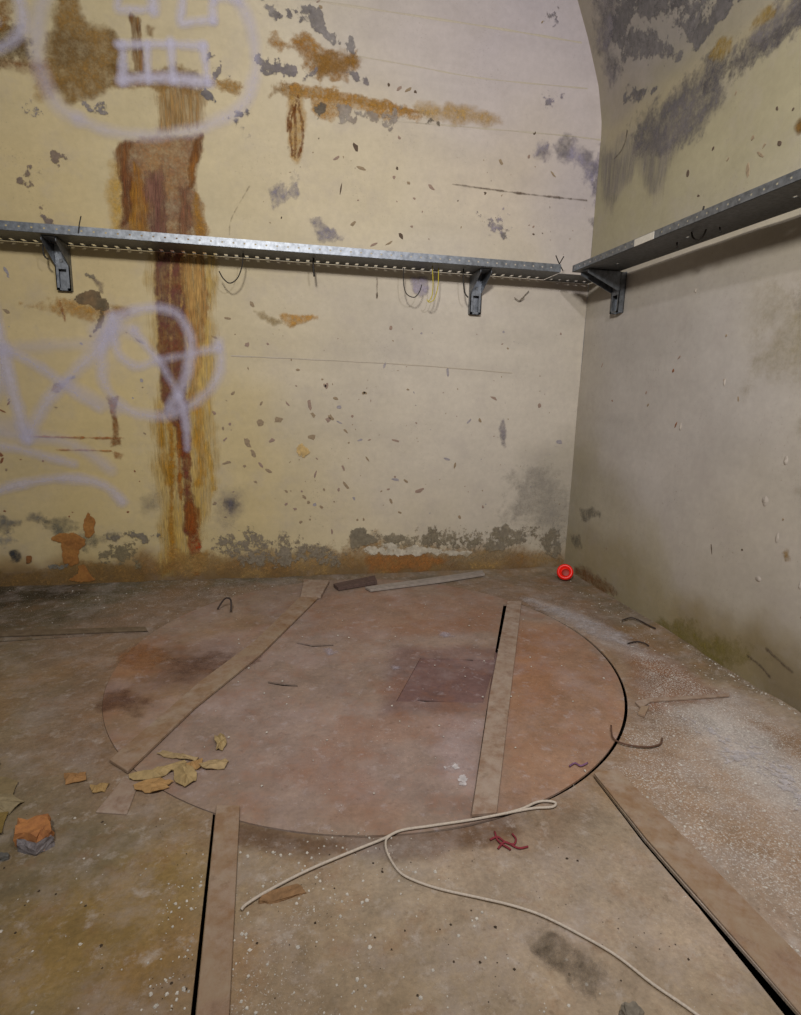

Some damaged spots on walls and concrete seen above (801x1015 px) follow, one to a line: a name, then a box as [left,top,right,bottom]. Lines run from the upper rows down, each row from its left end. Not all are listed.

peeling [264,0,355,54]
rust [211,80,242,93]
peeling [254,53,318,80]
rust [272,33,492,160]
damp [604,0,801,194]
rust [111,86,217,575]
rust [108,397,120,457]
damp [0,523,578,587]